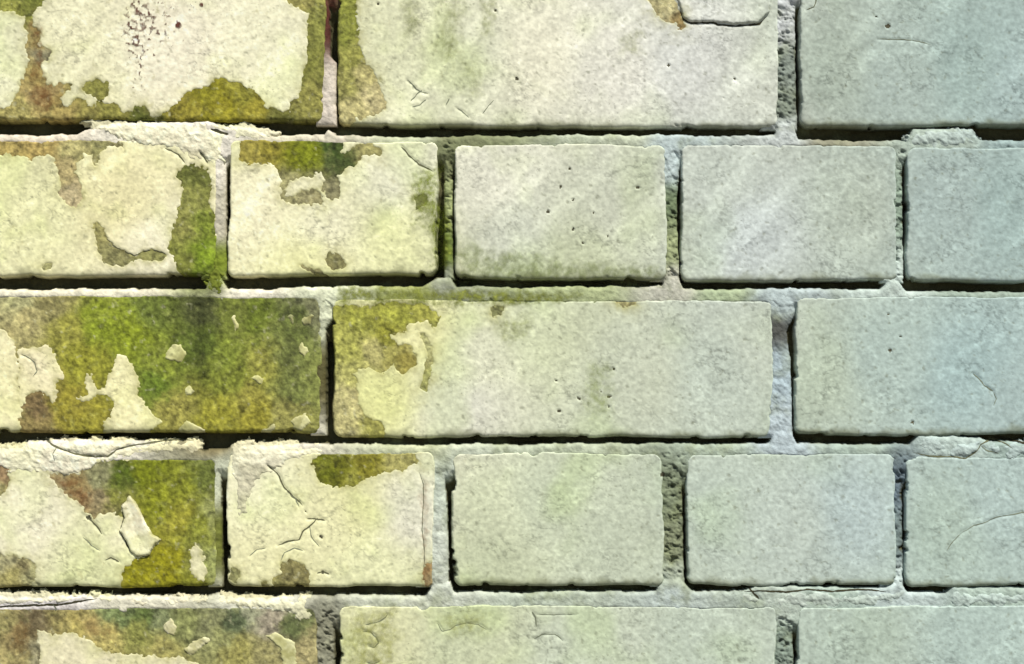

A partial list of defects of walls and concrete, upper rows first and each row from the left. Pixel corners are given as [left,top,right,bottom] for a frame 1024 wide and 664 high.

peeling [0,0,387,278]
peeling [414,194,428,210]
peeling [0,296,441,664]
crack [251,465,329,574]
crack [947,512,1023,550]